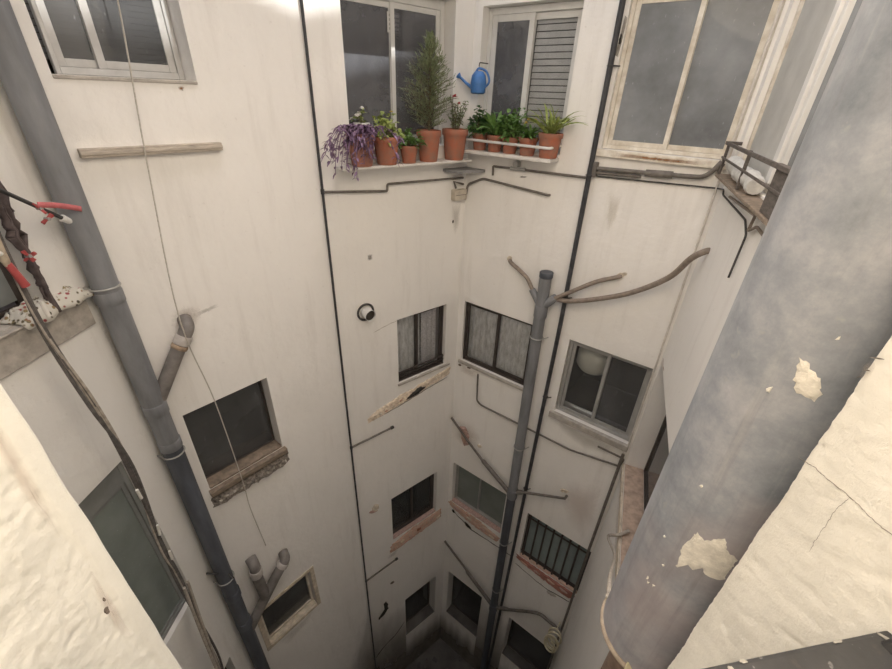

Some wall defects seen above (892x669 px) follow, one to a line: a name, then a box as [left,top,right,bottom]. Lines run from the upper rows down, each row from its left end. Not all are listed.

crack [800,458,892,550]